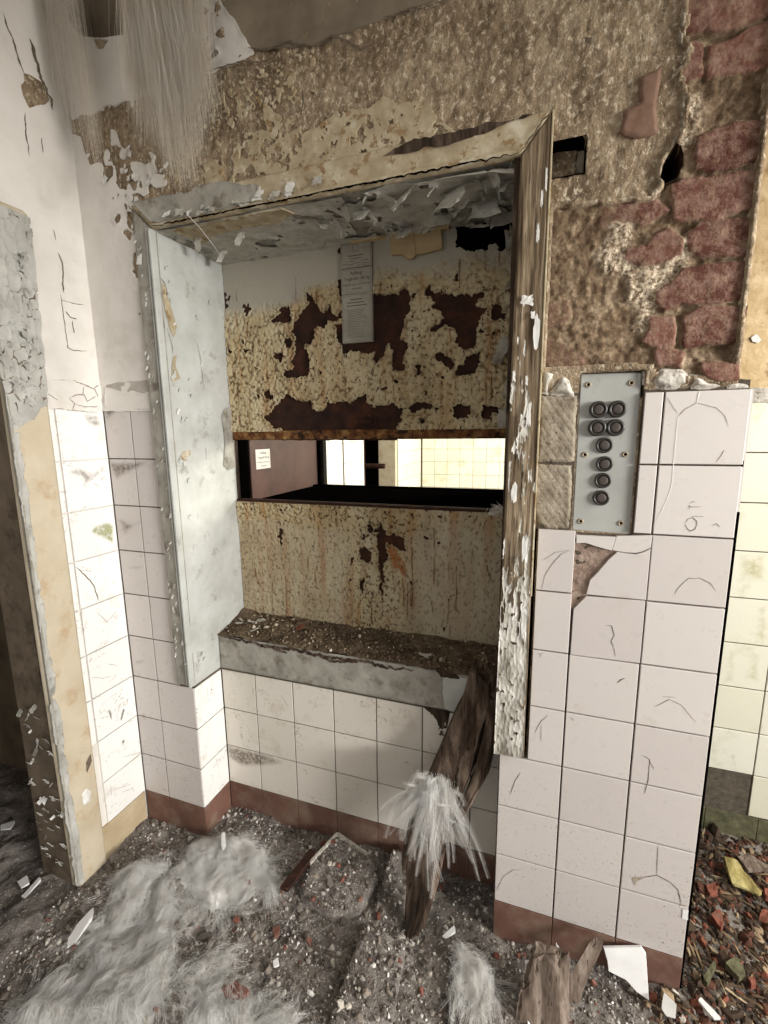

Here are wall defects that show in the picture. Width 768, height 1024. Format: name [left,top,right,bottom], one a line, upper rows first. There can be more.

crack [0,233,99,413]
corrosion [225,293,258,369]
corrosion [257,272,506,441]
flaking render [492,0,768,529]
peeling [0,0,533,886]
crack [655,391,729,531]
corrosion [350,522,413,612]
spalling [570,540,618,609]